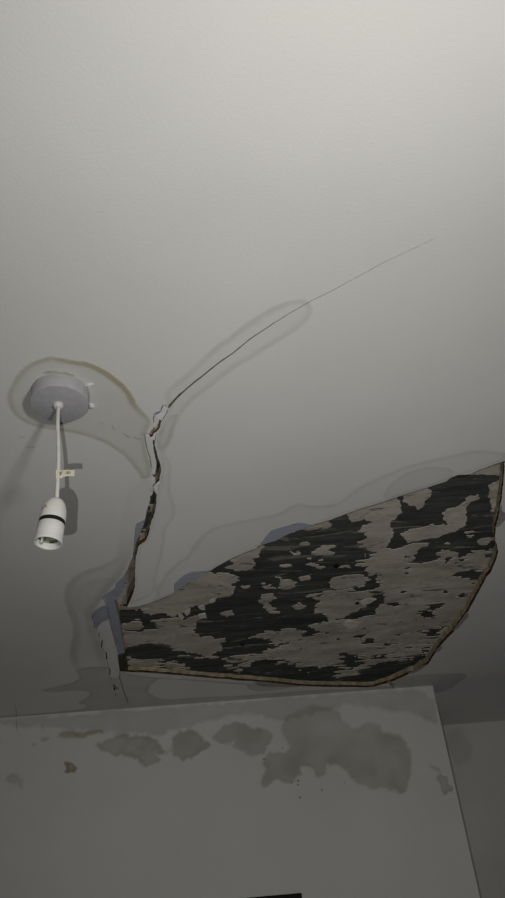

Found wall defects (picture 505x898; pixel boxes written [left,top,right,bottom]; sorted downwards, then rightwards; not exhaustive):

water stain [62,360,136,407]
crack [103,248,414,655]
spalling [92,461,505,701]